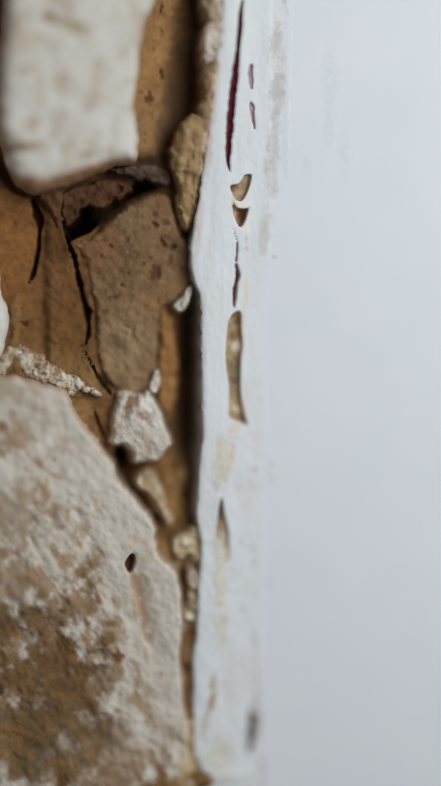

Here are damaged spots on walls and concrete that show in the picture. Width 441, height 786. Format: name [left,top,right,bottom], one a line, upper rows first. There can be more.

crack [225,1,255,171]
crack [28,182,158,395]
crack [93,408,105,438]
crack [118,464,161,524]
flaking render [0,0,294,786]